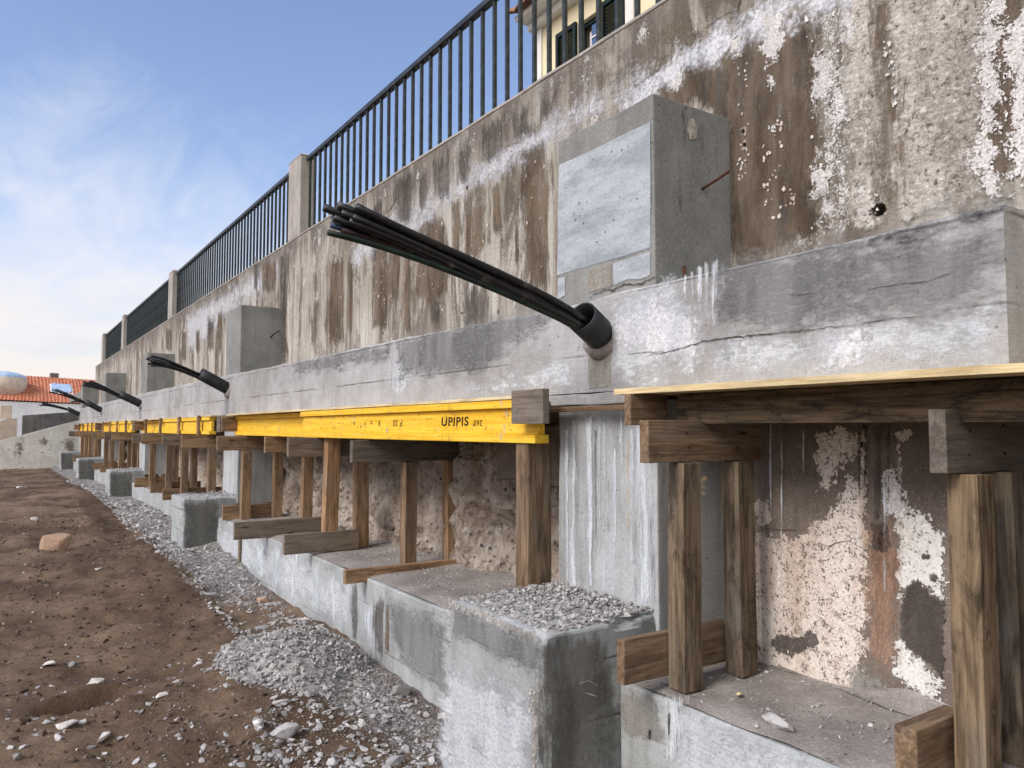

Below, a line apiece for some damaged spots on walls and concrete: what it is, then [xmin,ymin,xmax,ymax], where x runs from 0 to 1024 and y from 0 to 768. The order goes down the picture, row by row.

leakage [373,0,1013,387]
leakage [166,256,286,363]
leakage [297,244,546,392]
leakage [469,364,570,393]
crack [632,316,918,356]
peeling [754,425,950,704]
rust [865,521,898,666]